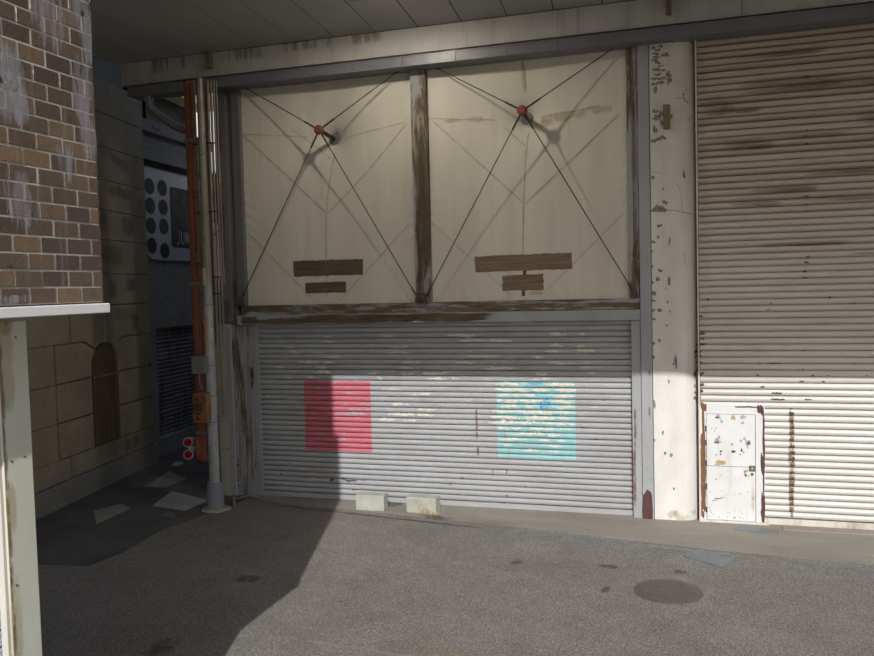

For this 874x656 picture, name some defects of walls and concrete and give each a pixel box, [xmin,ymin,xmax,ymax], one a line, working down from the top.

peeling [651,44,672,93]
peeling [651,109,673,143]
peeling [382,335,459,380]
peeling [447,333,512,342]
peeling [456,355,520,370]
peeling [333,392,435,422]
peeling [484,332,601,453]
rust [694,331,707,518]
spalling [711,414,751,466]
rust [734,405,765,522]